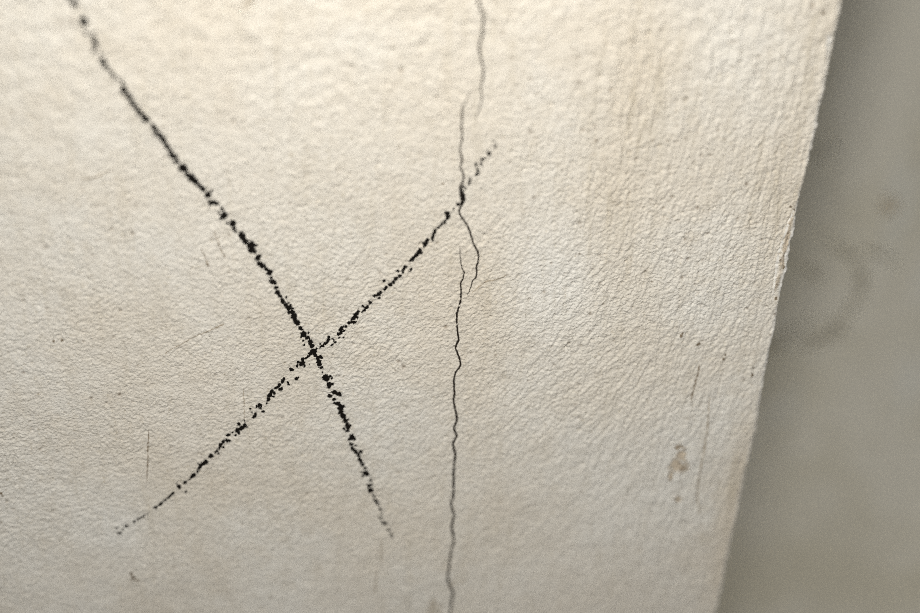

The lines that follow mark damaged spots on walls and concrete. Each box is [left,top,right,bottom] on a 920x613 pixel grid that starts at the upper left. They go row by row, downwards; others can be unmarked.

crack [447,0,485,613]